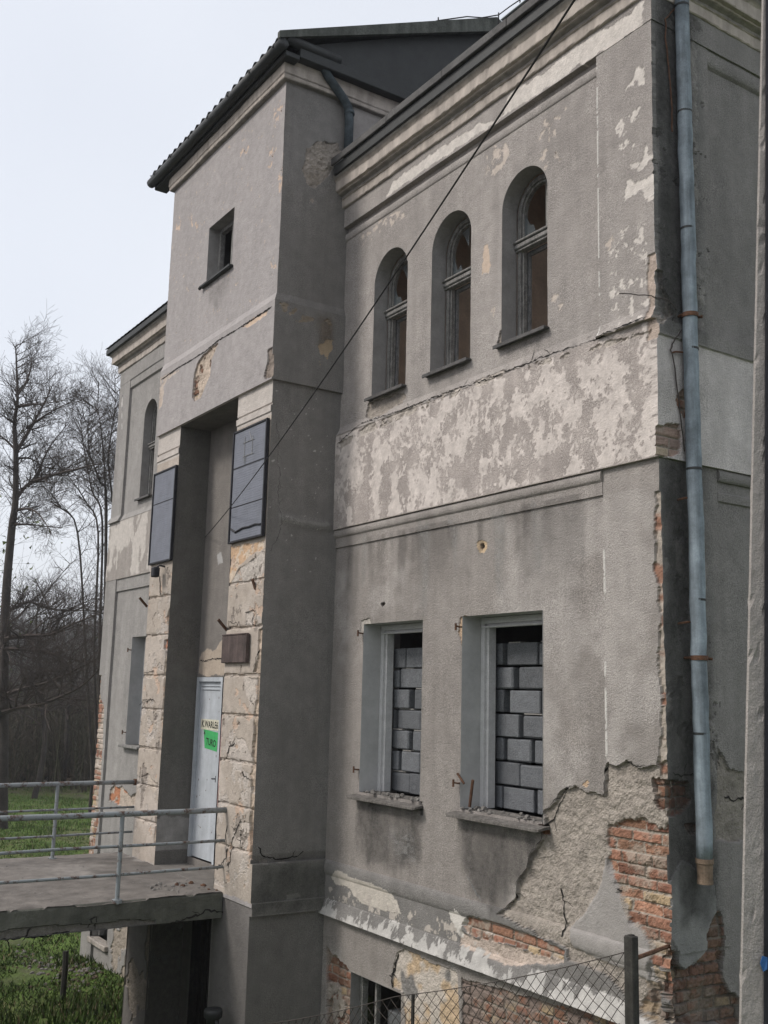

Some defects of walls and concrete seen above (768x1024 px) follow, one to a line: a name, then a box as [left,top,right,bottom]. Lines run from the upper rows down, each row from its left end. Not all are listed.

flaking render [302,141,341,203]
peeling [387,0,679,201]
crack [337,317,645,444]
peeling [334,211,685,526]
peeling [89,680,189,854]
flaking render [214,541,284,887]
crack [218,820,303,866]
flaking render [318,492,739,1024]
crack [498,786,570,912]
crack [560,888,573,937]
crack [603,762,694,790]
flaking render [707,648,745,842]